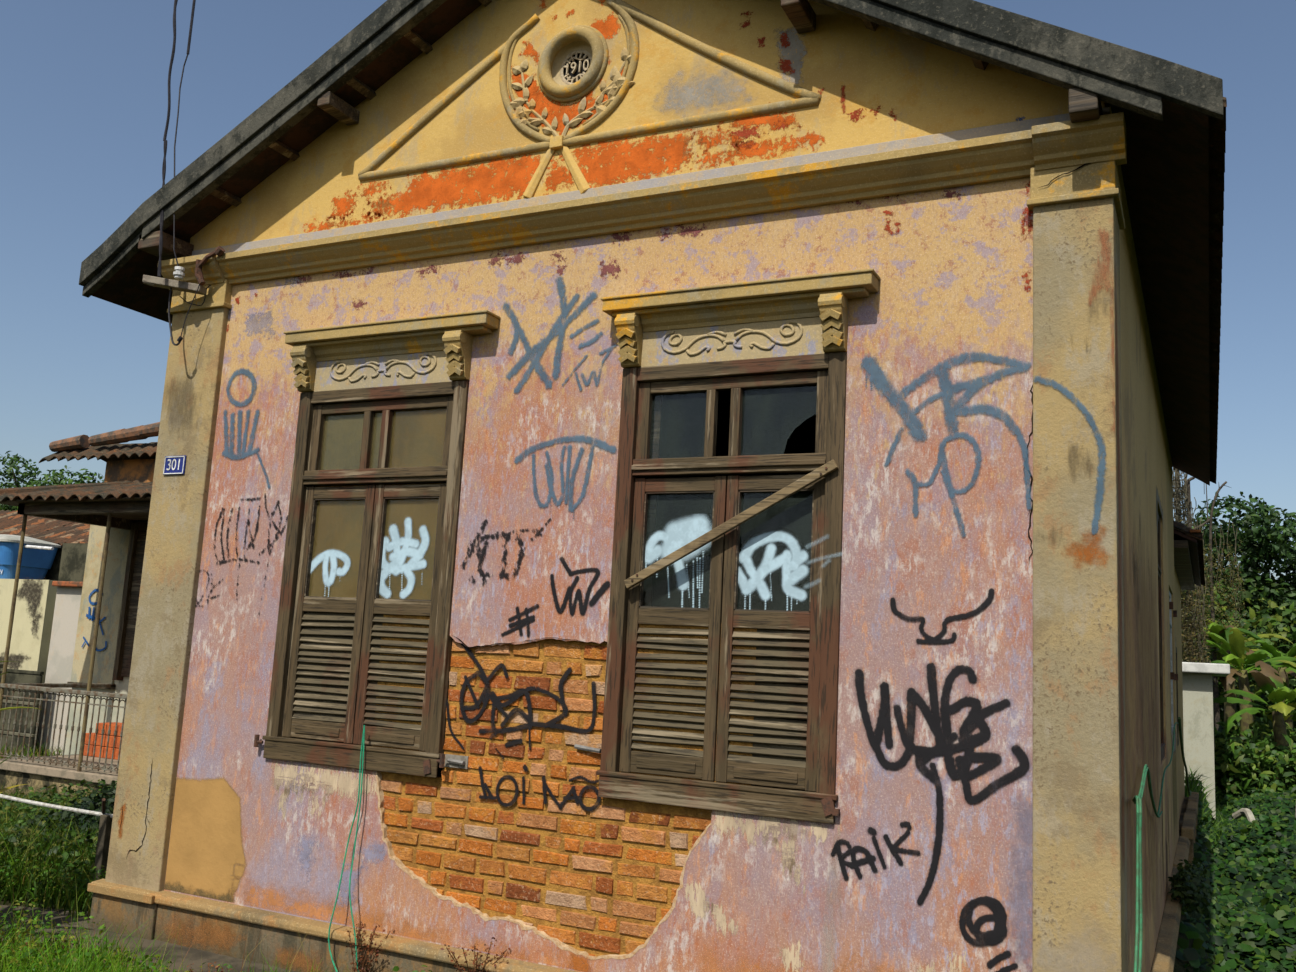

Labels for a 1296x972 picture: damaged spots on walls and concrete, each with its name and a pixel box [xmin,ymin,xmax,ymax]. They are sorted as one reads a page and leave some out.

peeling [509,41,608,135]
peeling [591,0,623,76]
peeling [759,28,807,84]
peeling [847,105,897,123]
peeling [304,111,824,232]
crack [1039,163,1091,188]
rust [1072,231,1125,853]
water stain [17,578,42,634]
flaking render [272,614,839,960]
peeling [777,941,804,972]